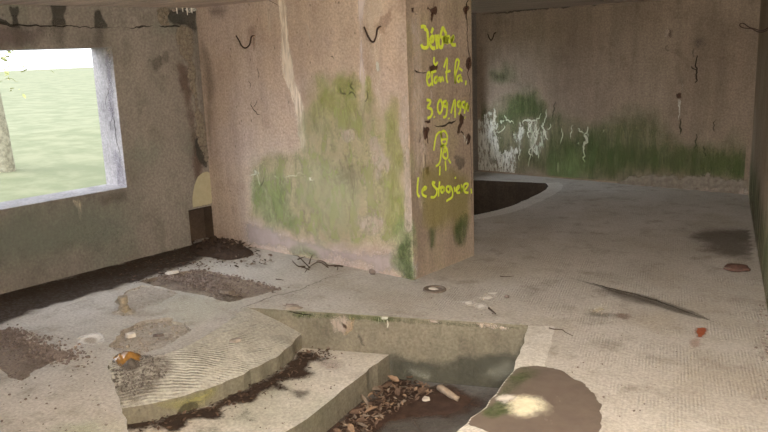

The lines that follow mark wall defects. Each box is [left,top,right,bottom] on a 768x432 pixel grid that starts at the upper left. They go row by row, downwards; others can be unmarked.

damp [9,7,20,28]
damp [50,5,66,26]
crack [0,19,184,29]
damp [95,10,107,28]
damp [278,0,305,153]
damp [478,110,551,173]
damp [694,231,750,255]